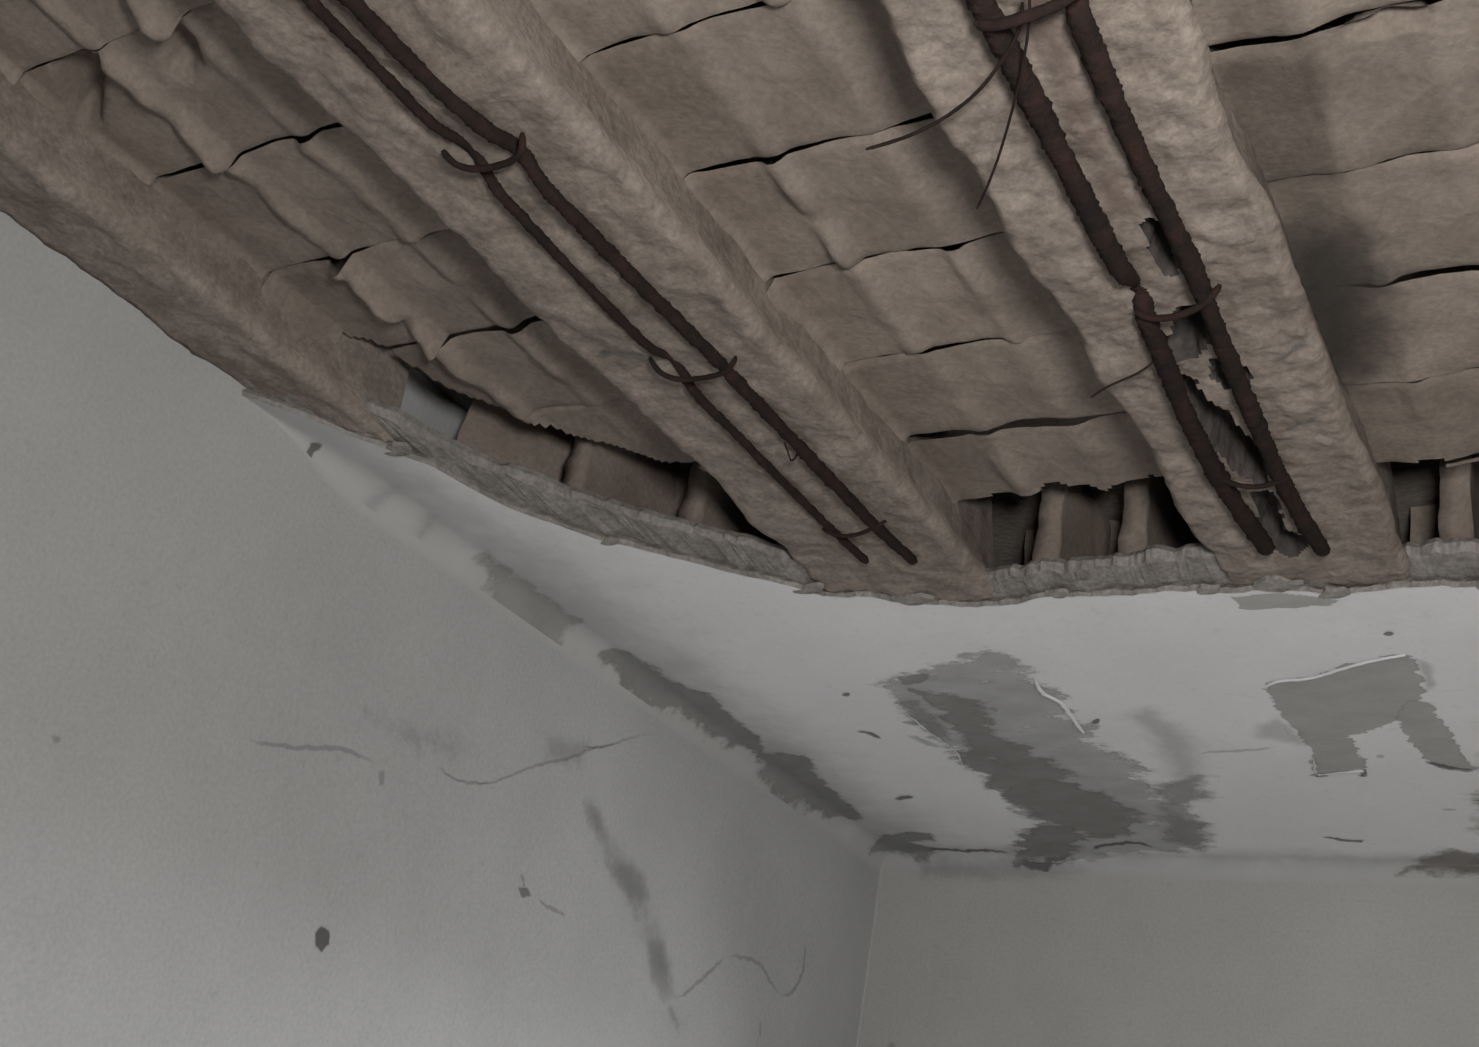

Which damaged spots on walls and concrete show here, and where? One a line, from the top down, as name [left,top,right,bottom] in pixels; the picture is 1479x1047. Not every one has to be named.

spalling [1139,218,1179,277]
spalling [236,379,1479,610]
spalling [1166,304,1309,558]
peeling [879,650,1209,866]
peeling [1264,654,1479,777]